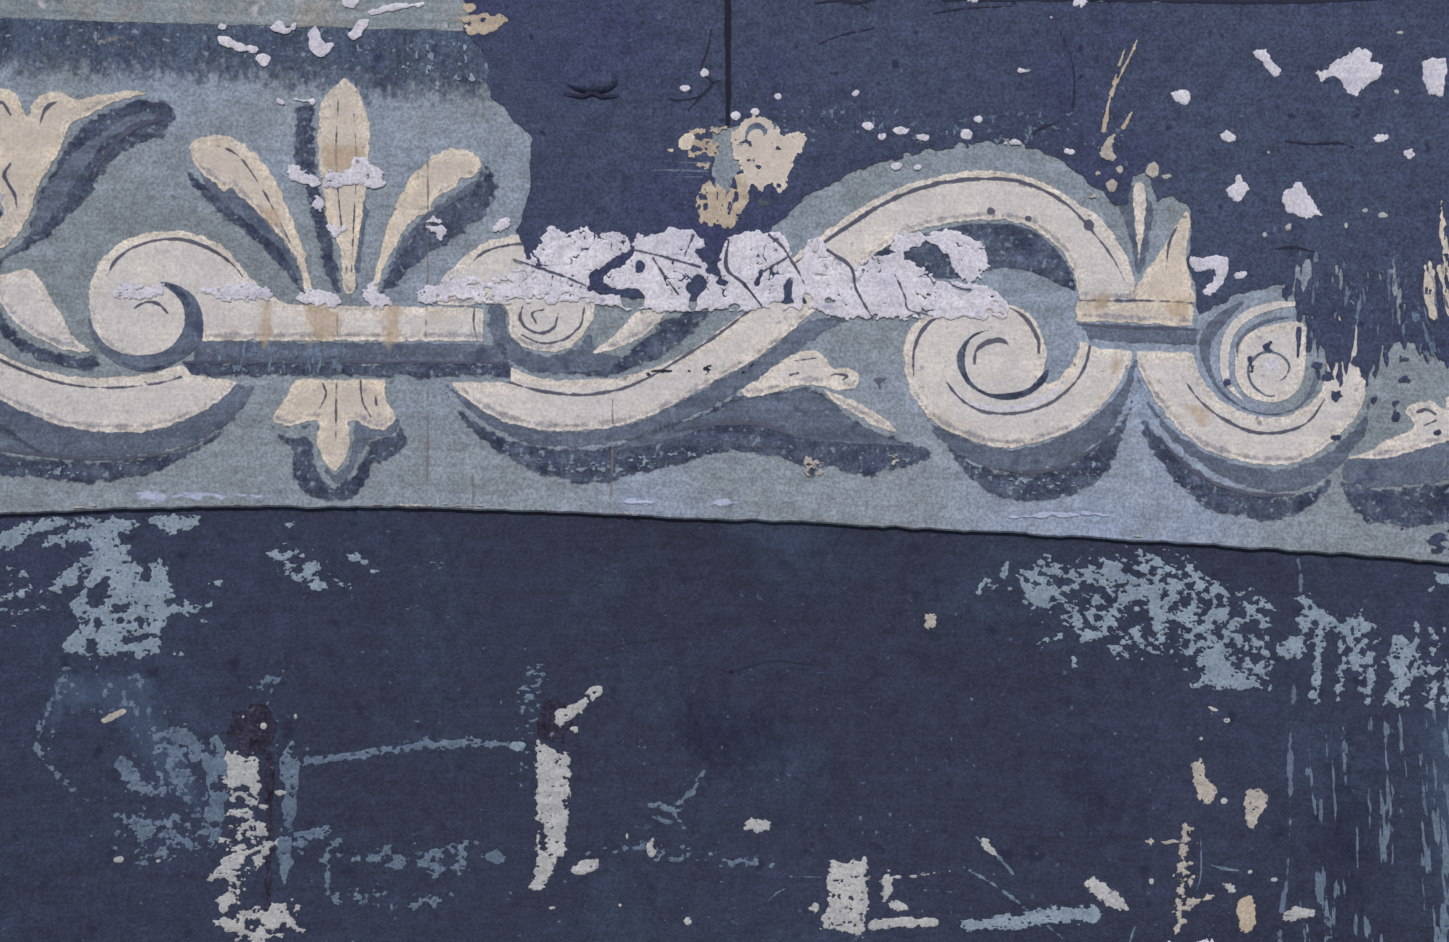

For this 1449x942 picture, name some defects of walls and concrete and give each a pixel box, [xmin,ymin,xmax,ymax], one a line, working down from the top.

crack [669,0,732,126]
crack [814,0,874,44]
crack [933,0,1364,135]
peeling [1316,47,1383,97]
peeling [1226,174,1249,202]
peeling [1282,182,1322,231]
peeling [416,226,1009,321]
peeling [1299,200,1449,364]
peeling [0,503,213,661]
peeling [963,535,1449,942]
peeling [201,735,505,942]
peeling [808,856,950,938]